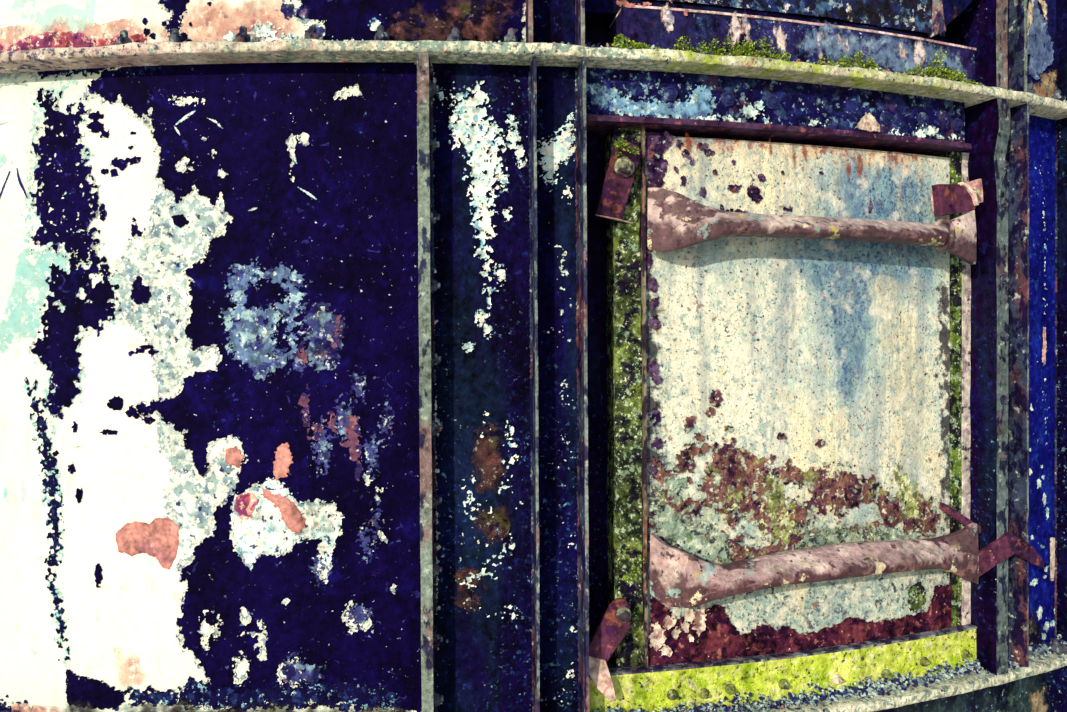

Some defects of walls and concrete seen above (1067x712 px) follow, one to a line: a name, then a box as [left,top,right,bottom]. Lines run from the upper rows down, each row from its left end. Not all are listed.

corrosion [0,16,167,51]
peeling [142,0,192,42]
corrosion [180,2,290,42]
peeling [280,0,466,41]
corrosion [388,0,513,42]
peeling [431,63,527,353]
peeling [0,62,422,712]
peeling [498,420,523,509]
corrosion [647,389,944,564]
corrosion [116,518,179,570]
peeling [459,475,518,620]
corrosion [454,568,488,611]